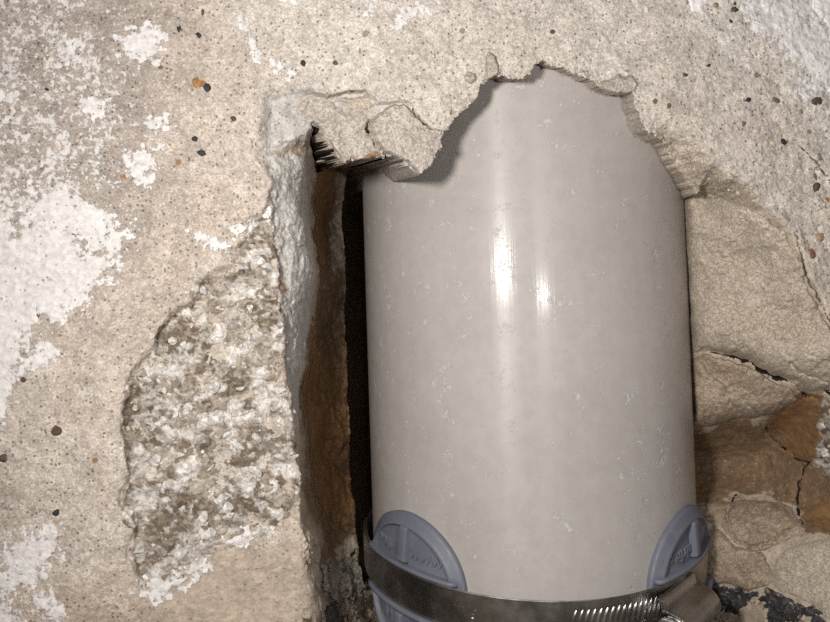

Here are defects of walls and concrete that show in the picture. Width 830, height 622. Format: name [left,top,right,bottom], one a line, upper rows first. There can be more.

peeling [464,51,501,84]
damp [735,0,830,104]
peeling [296,95,444,187]
crack [798,145,830,183]
damp [0,0,178,426]
crack [795,234,830,322]
spalling [120,209,300,582]
crack [711,352,830,397]
crack [757,417,811,525]
spalling [812,400,830,478]
damp [0,518,77,622]
damp [712,582,825,622]